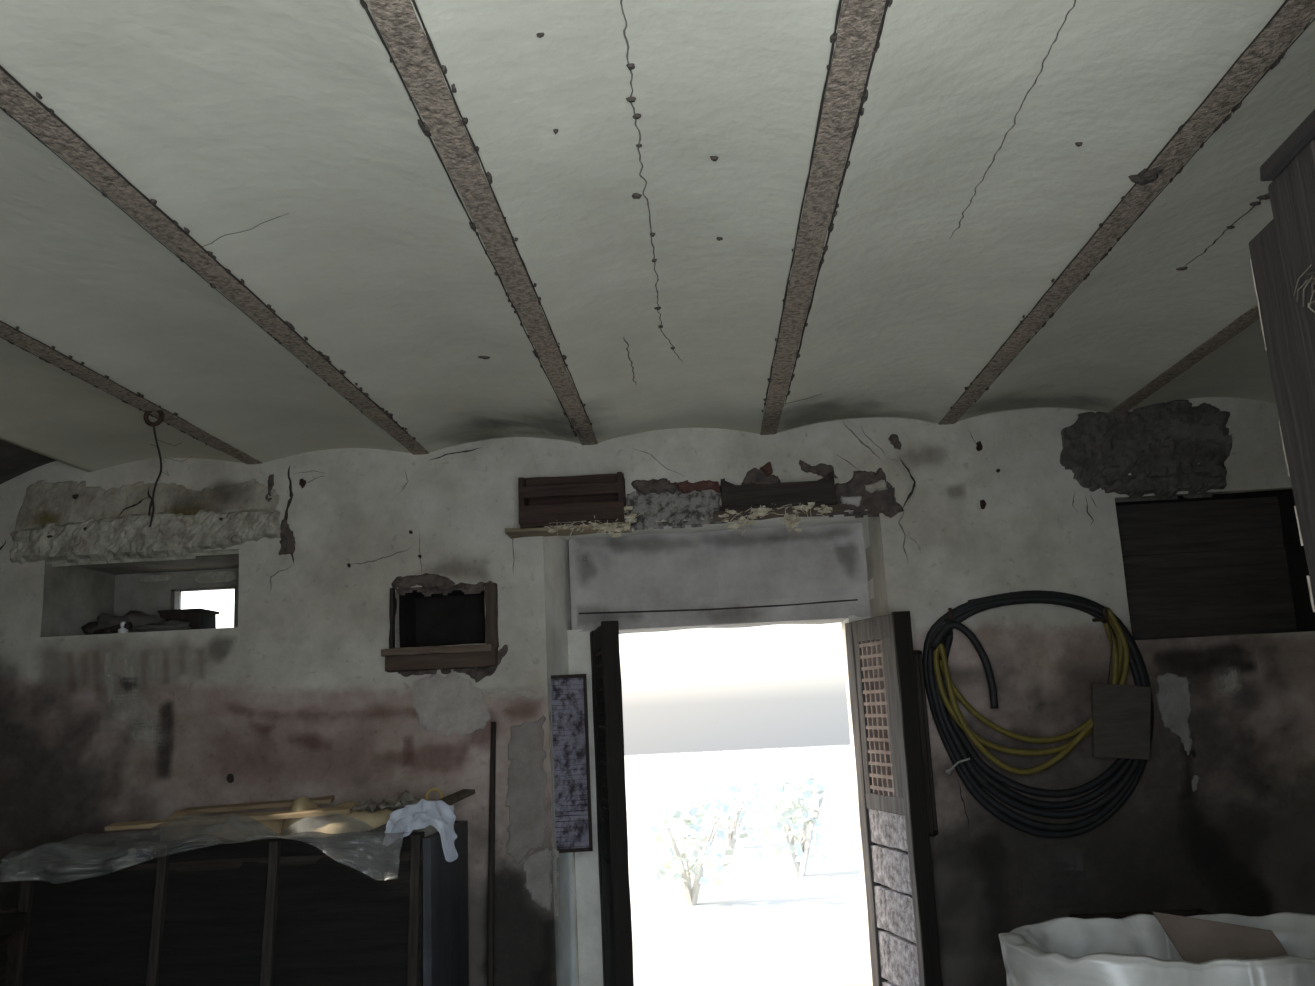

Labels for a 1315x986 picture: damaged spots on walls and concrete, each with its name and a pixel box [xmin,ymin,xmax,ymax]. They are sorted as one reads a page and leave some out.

crack [949,0,1076,239]
crack [620,0,683,362]
crack [1176,193,1270,271]
crack [624,339,635,382]
peeling [15,474,295,555]
crack [284,466,326,520]
flaking render [631,478,721,496]
spalling [1060,400,1233,502]
spalling [1306,576,1315,612]
leakage [105,653,173,776]
peeling [1155,673,1196,758]
leakage [0,696,111,908]